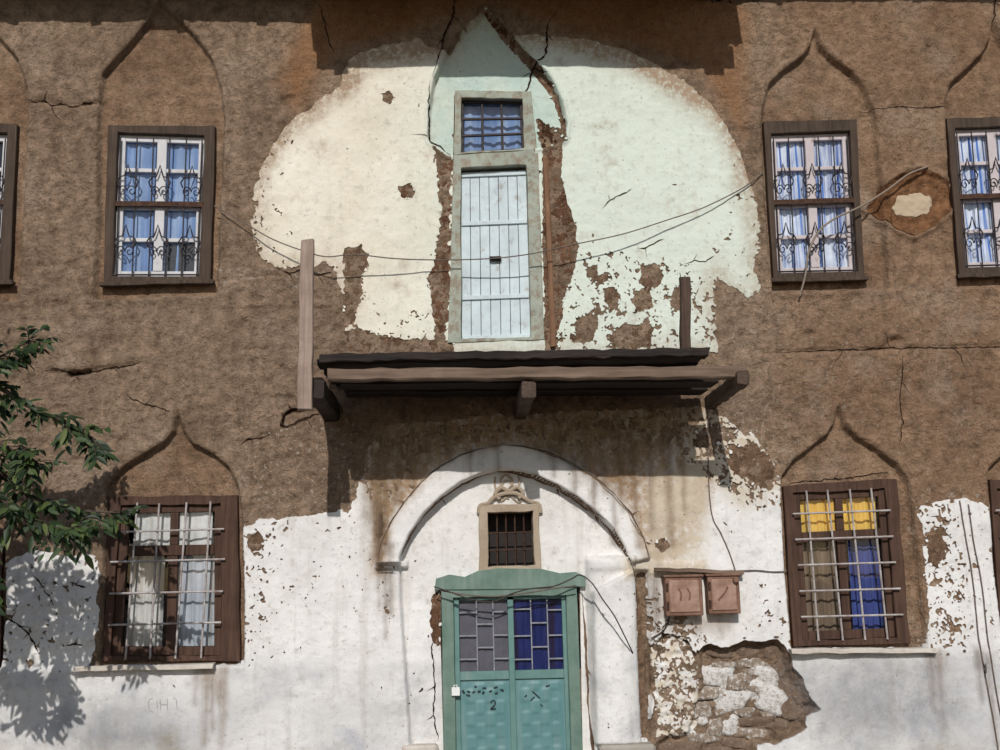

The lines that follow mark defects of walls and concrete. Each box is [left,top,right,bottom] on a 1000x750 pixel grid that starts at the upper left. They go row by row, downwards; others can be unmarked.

crack [523,12,557,91]
crack [28,92,96,119]
flaking render [484,8,599,350]
flaking render [338,148,455,354]
flaking render [589,263,680,349]
crack [54,363,138,381]
crack [240,401,339,445]
flaking render [693,424,776,492]
flaking render [925,525,950,568]
spalling [648,634,803,750]